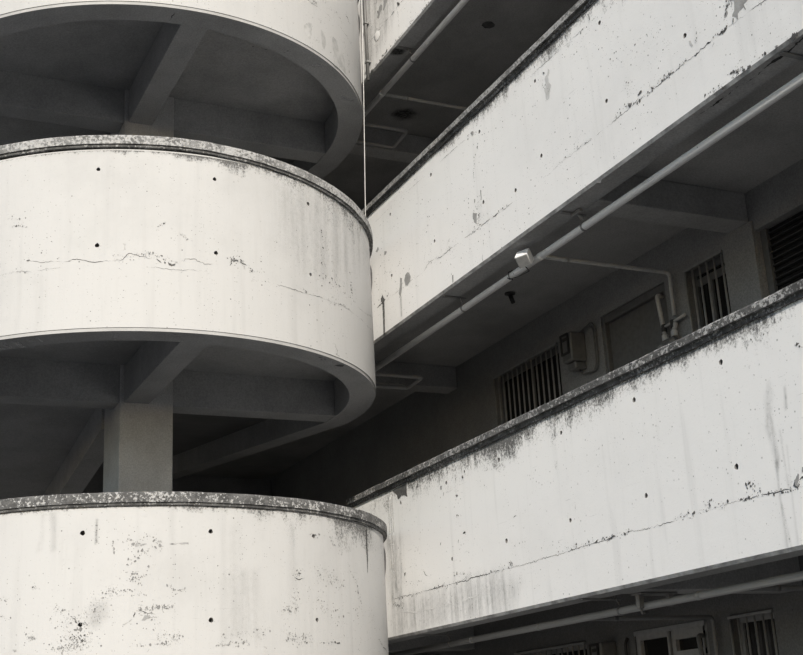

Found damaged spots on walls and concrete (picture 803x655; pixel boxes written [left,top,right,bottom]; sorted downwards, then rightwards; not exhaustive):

peeling [721,0,747,20]
crack [558,0,765,165]
crack [702,37,803,113]
crack [17,250,206,273]
leakage [374,309,781,542]
leakage [327,516,372,569]
crack [393,487,794,609]